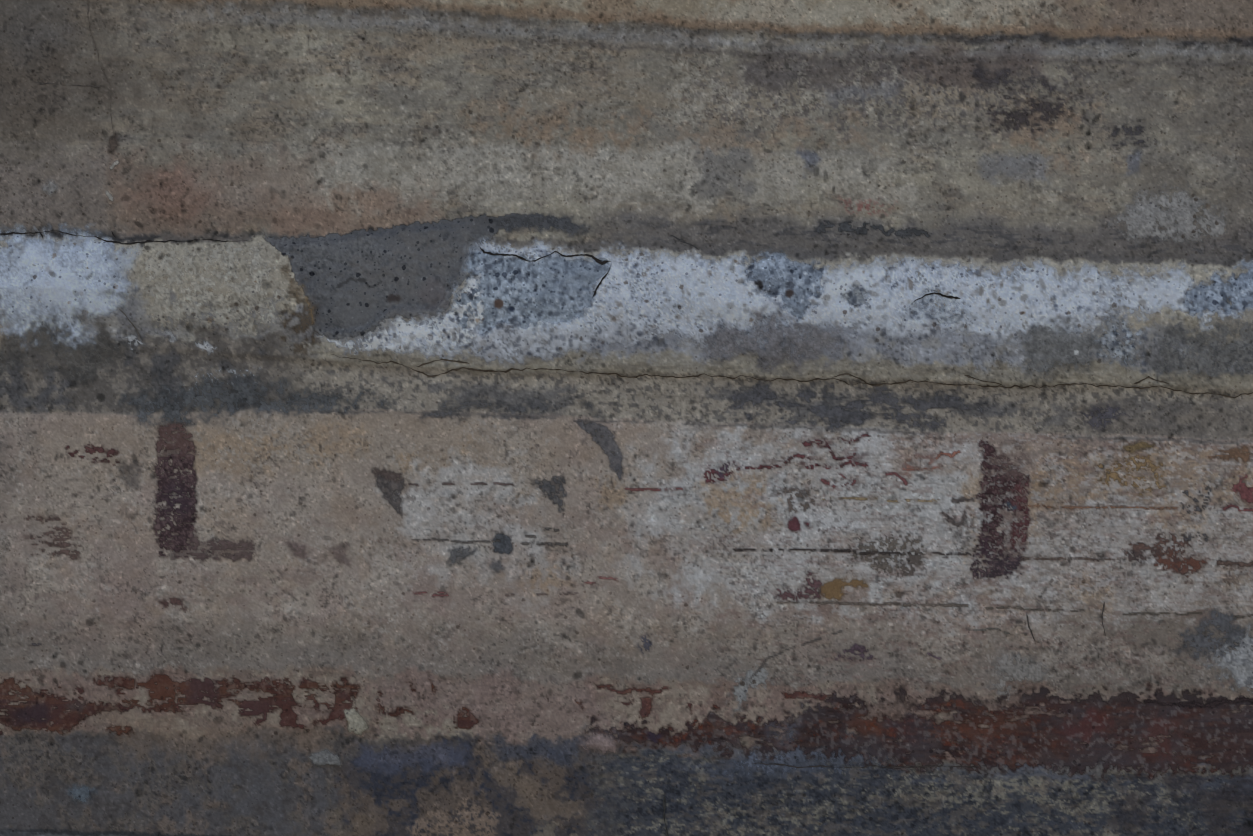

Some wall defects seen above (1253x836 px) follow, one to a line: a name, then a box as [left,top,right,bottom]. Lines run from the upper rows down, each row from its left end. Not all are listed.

leakage [495,214,588,237]
leakage [815,221,930,239]
crack [480,247,610,298]
leakage [327,274,484,352]
leakage [195,341,217,353]
crack [332,354,1253,398]
leakage [706,312,988,432]
leakage [1023,319,1092,373]
leakage [1150,323,1253,377]